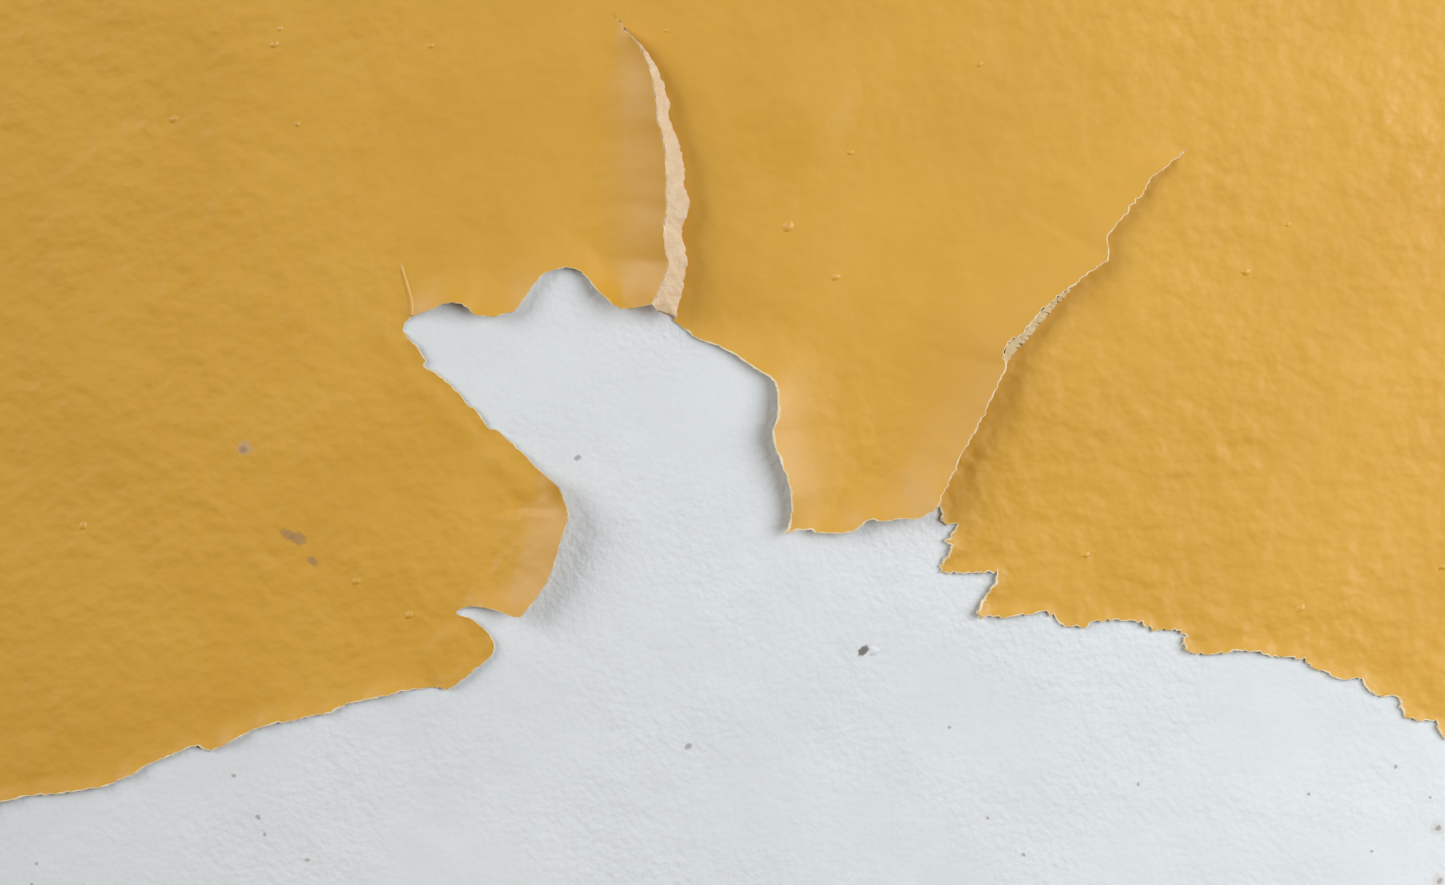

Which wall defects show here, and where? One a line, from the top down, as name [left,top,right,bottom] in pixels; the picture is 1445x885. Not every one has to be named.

peeling [395,13,690,329]
peeling [675,131,1191,534]
peeling [0,267,1445,885]